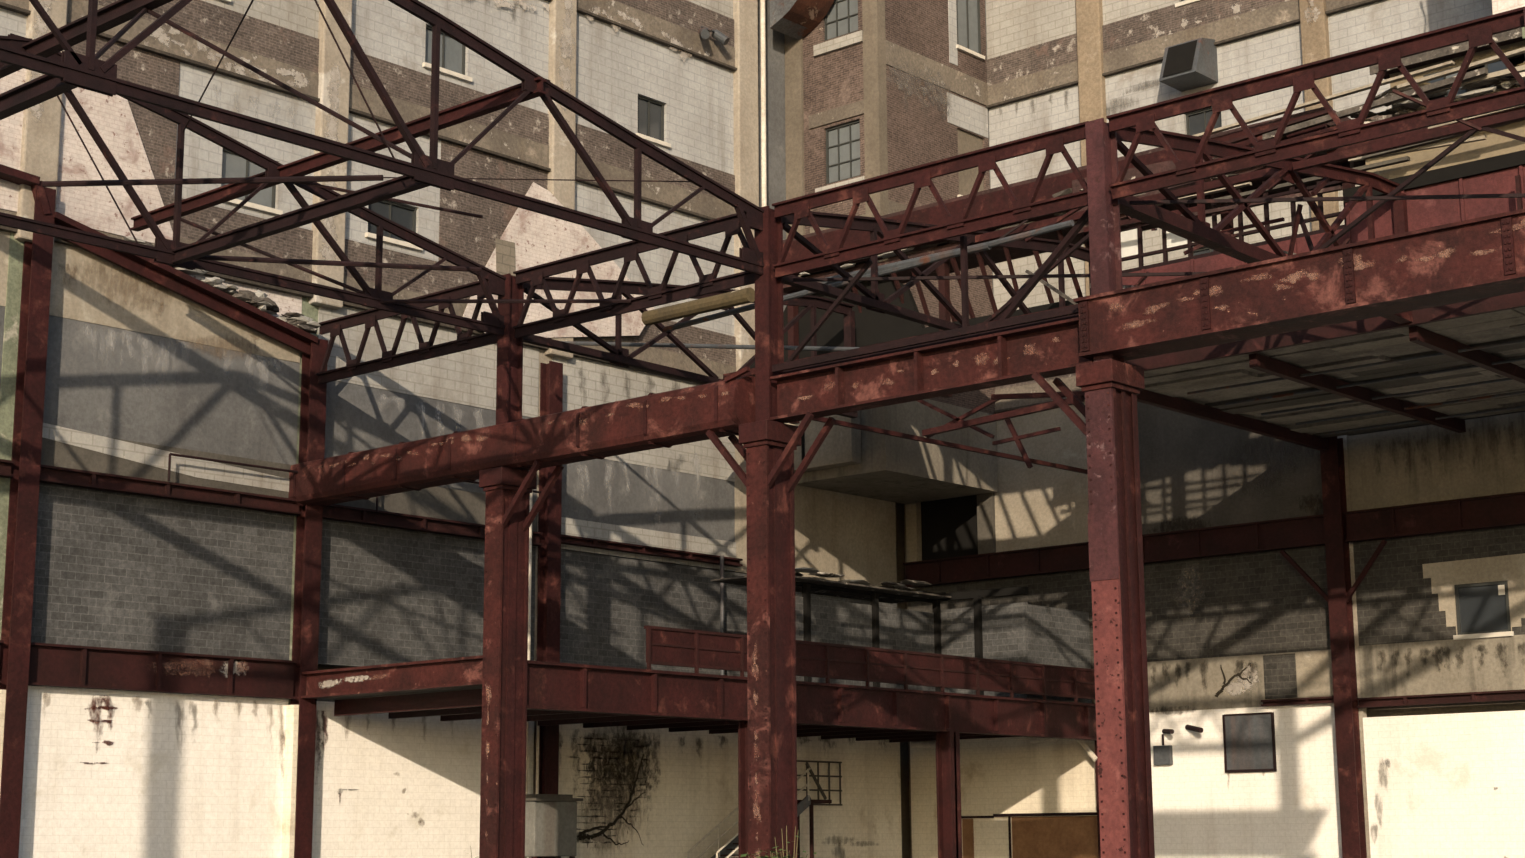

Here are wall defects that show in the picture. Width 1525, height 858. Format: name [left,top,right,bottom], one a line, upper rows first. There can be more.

peeling [493,0,643,132]
peeling [661,31,710,63]
corrosion [82,697,117,764]